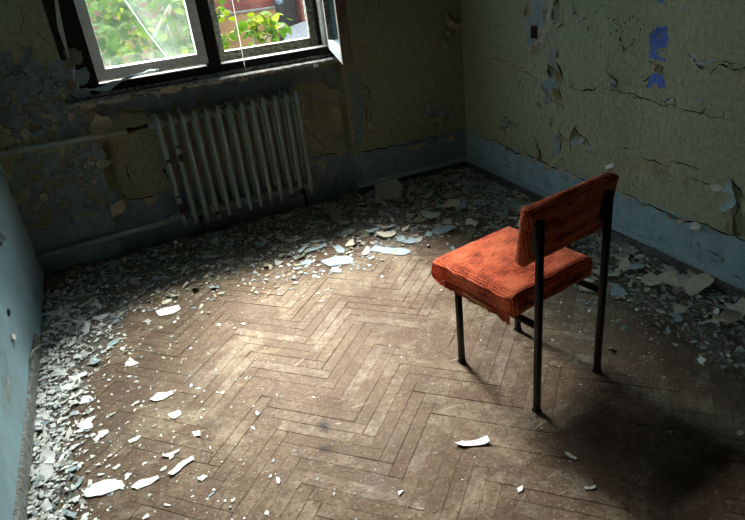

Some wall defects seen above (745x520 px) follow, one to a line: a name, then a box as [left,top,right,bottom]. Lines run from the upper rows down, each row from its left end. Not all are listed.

peeling [0,0,338,151]
peeling [520,0,565,109]
peeling [640,23,669,89]
crack [566,82,744,123]
crack [618,147,711,185]
peeling [709,177,744,236]